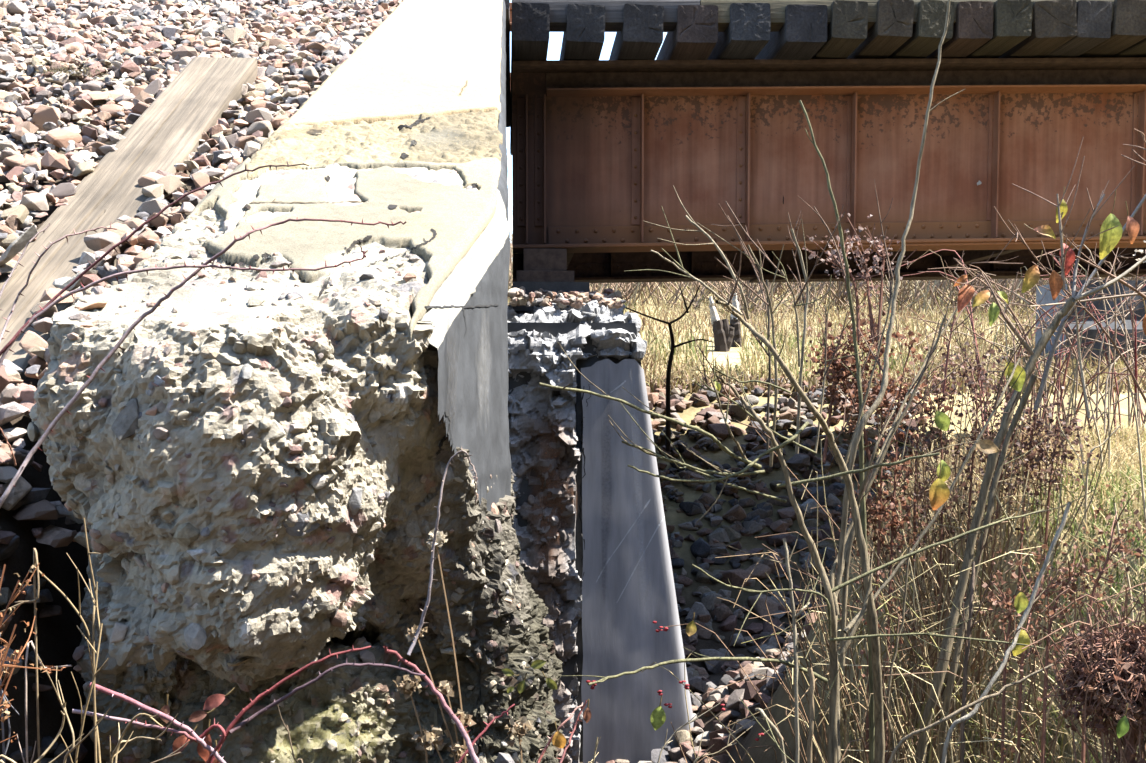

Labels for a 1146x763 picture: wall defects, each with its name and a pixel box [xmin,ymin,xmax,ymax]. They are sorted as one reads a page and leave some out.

crack [251,197,366,205]
crack [319,229,437,297]
spalling [27,163,647,763]